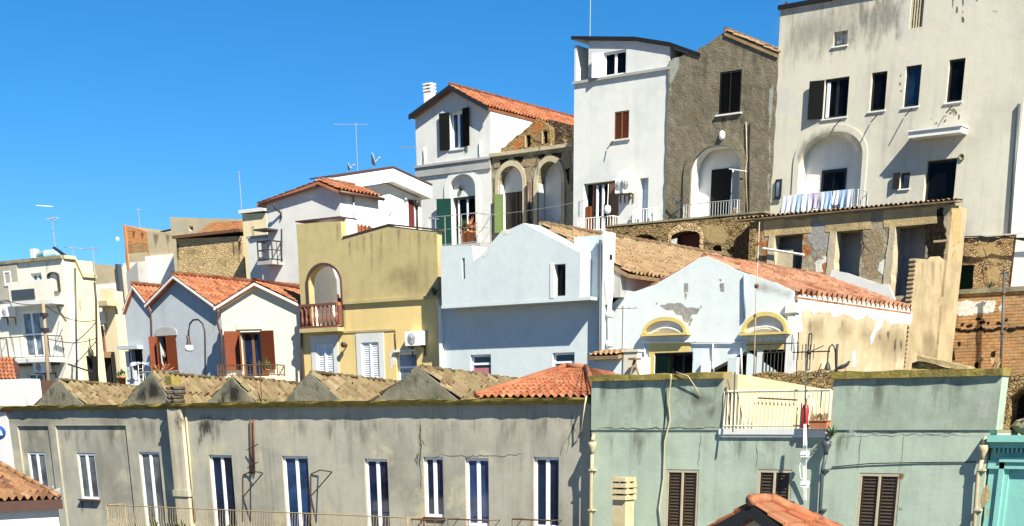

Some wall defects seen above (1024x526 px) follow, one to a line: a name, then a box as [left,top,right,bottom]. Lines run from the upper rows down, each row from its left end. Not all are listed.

spalling [802,222,830,274]
spalling [656,283,702,326]
flaking render [798,294,912,345]
flaking render [952,300,1024,360]
crack [415,420,518,490]